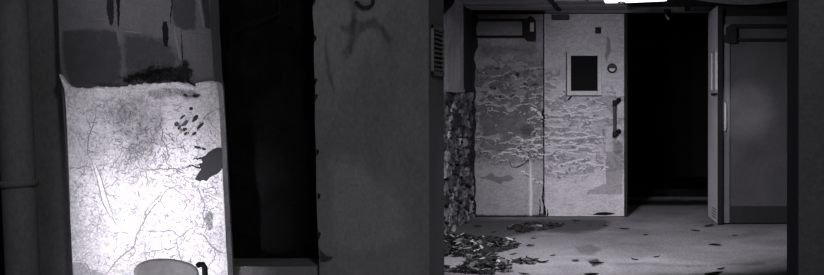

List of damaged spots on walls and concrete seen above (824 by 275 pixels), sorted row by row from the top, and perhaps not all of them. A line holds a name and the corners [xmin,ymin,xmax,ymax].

crack [106,0,120,29]
crack [73,98,226,275]
peeling [476,64,611,192]